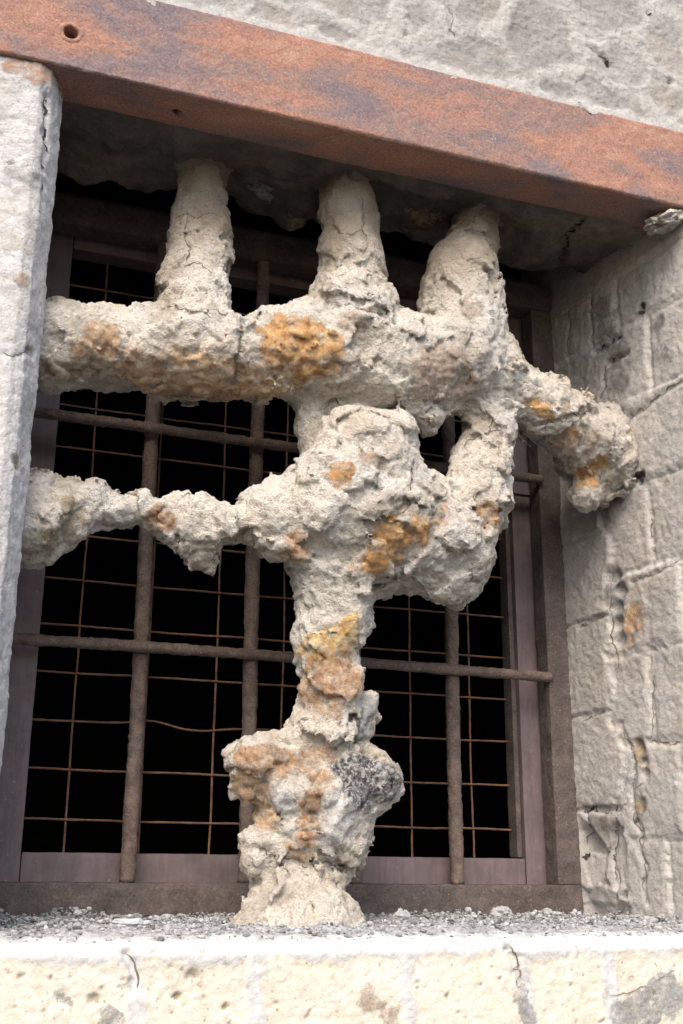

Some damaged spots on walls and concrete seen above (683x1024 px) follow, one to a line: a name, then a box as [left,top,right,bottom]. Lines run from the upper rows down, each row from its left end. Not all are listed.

corrosion [2,60,63,103]
crack [178,213,218,271]
crack [346,200,368,254]
corrosion [71,320,121,364]
corrosion [255,311,366,391]
corrosion [325,451,380,489]
corrosion [362,502,448,576]
corrosion [472,501,501,526]
corrosion [295,611,359,668]
corrosion [231,742,337,861]
crack [583,682,682,903]
crack [511,947,537,1024]